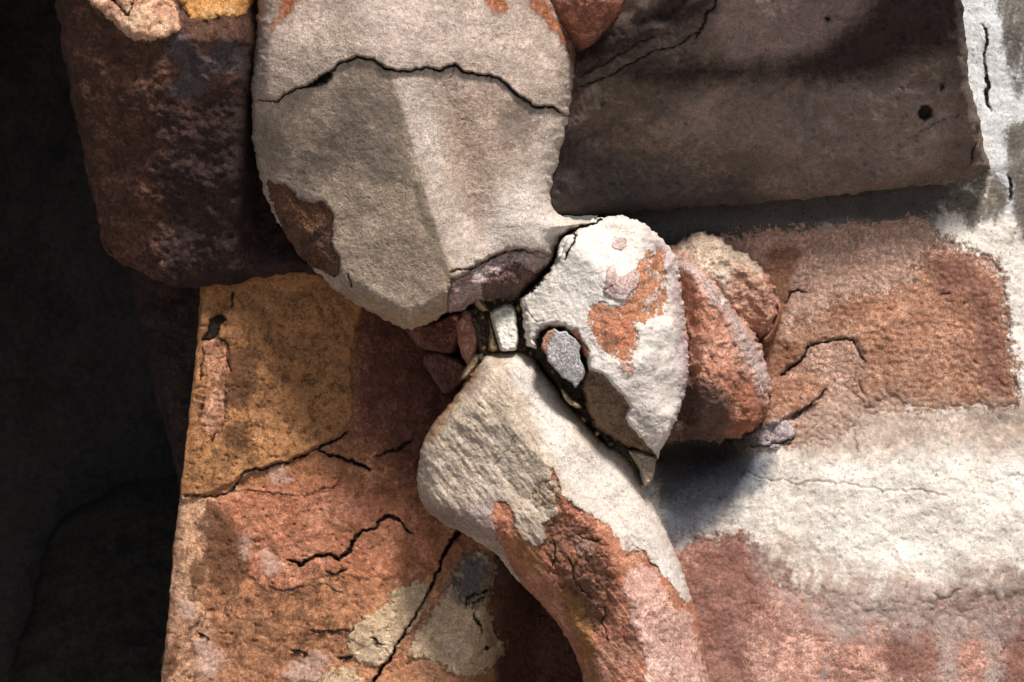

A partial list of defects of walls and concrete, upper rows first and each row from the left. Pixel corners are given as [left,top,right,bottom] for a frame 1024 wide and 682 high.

crack [581,0,717,87]
crack [910,28,991,160]
crack [1006,176,1014,198]
crack [781,338,863,385]
crack [185,432,412,498]
crack [270,515,412,593]
crack [291,531,460,682]